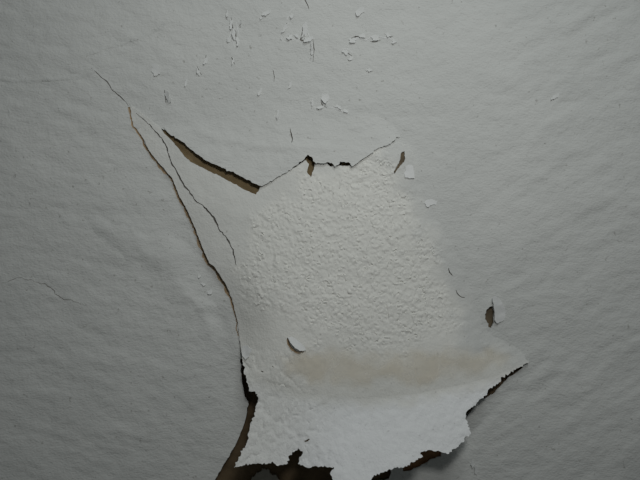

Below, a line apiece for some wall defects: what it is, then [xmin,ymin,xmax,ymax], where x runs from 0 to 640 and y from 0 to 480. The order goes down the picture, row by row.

crack [91,68,239,335]
peeling [130,94,529,480]